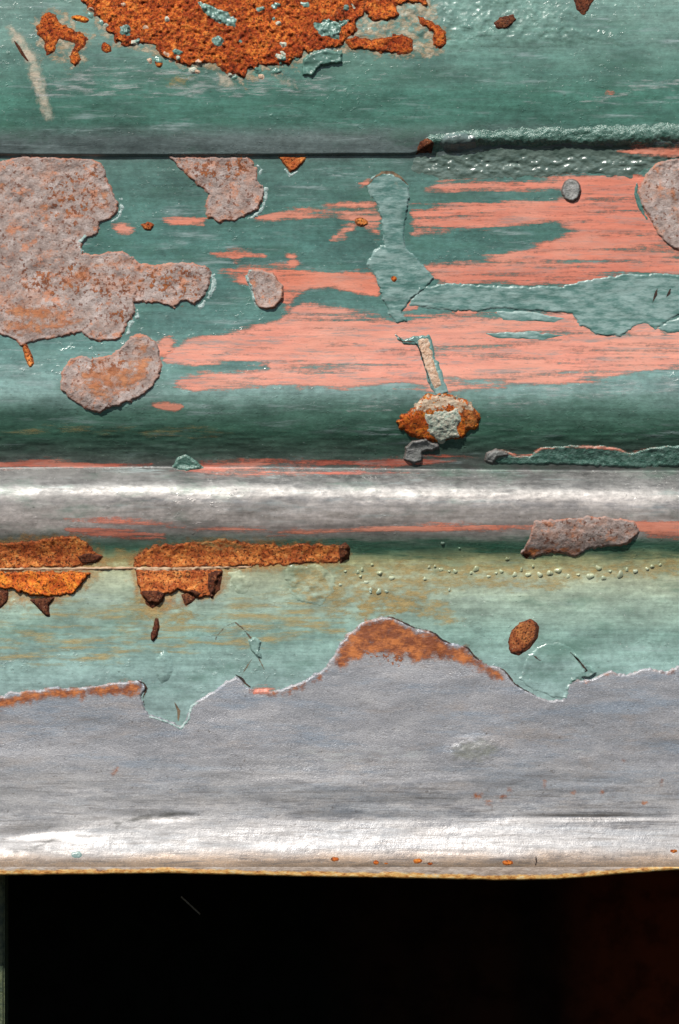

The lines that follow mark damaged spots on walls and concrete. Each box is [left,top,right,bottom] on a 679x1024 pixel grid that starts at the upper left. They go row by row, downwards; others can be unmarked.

rust [33,0,447,89]
peeling [113,224,134,235]
peeling [156,171,679,395]
peeling [152,402,184,411]
rust [396,393,481,444]
rust [0,536,678,696]
peeling [0,616,679,867]